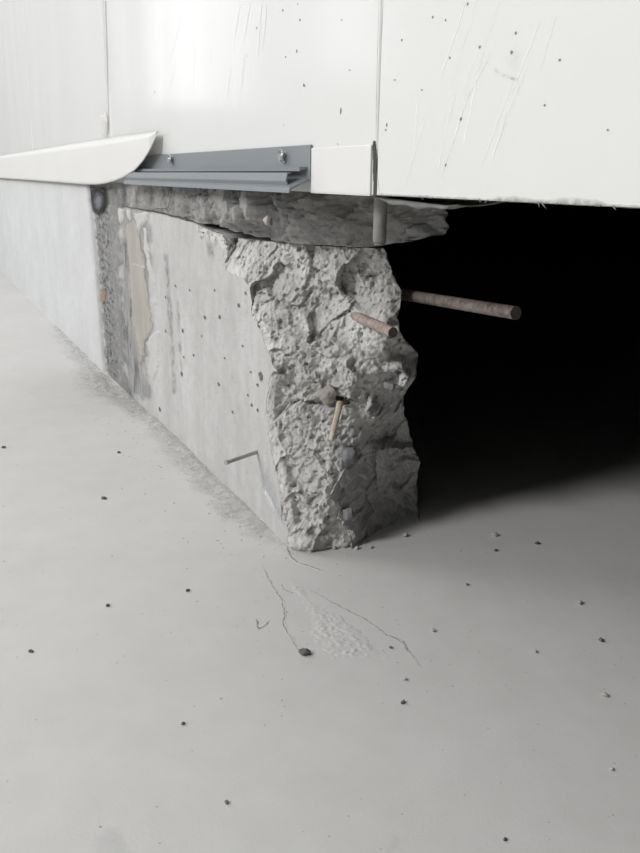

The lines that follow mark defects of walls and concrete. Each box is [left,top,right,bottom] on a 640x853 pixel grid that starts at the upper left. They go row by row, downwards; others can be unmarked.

peeling [118,207,166,383]
spalling [199,225,522,553]
crack [264,546,420,666]